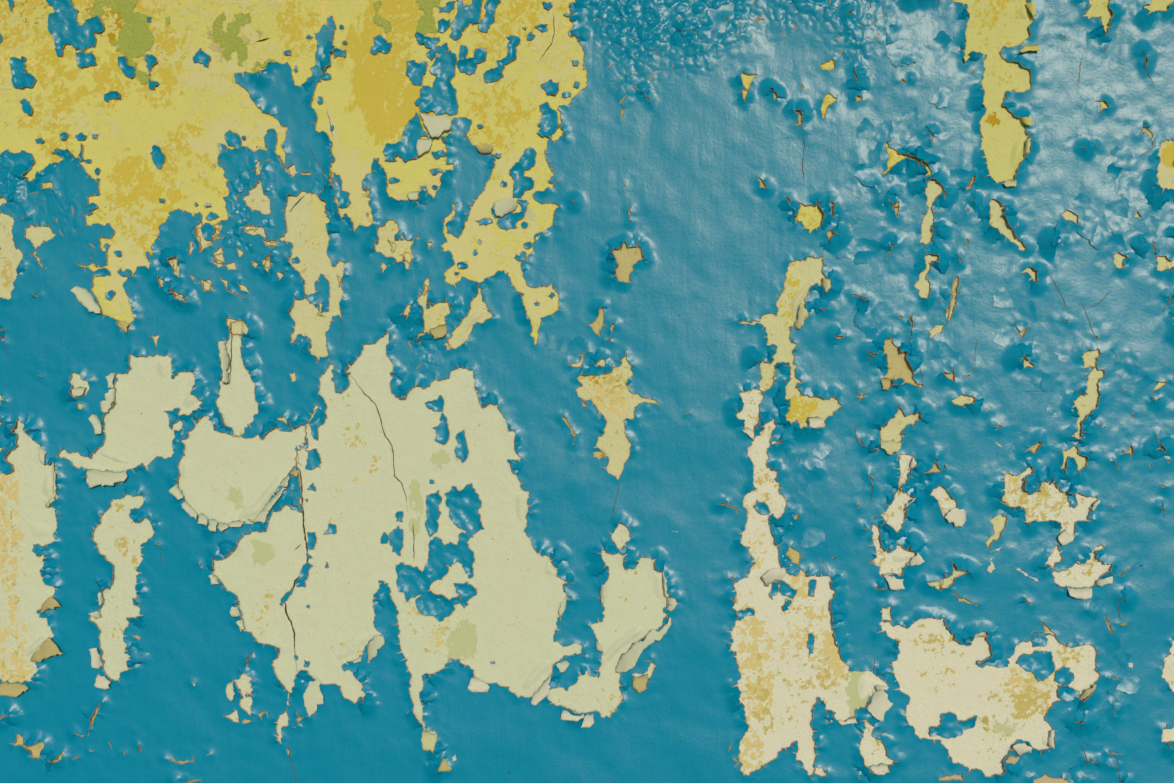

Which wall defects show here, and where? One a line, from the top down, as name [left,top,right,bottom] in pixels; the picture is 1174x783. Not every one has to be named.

peeling [739,68,757,101]
peeling [820,59,835,72]
peeling [821,93,838,118]
peeling [845,0,1040,407]
peeling [1051,124,1174,272]
peeling [0,0,678,772]
peeling [719,196,1141,783]
peeling [986,336,1170,600]
peeling [1161,640,1174,693]
peeling [1161,724,1174,749]